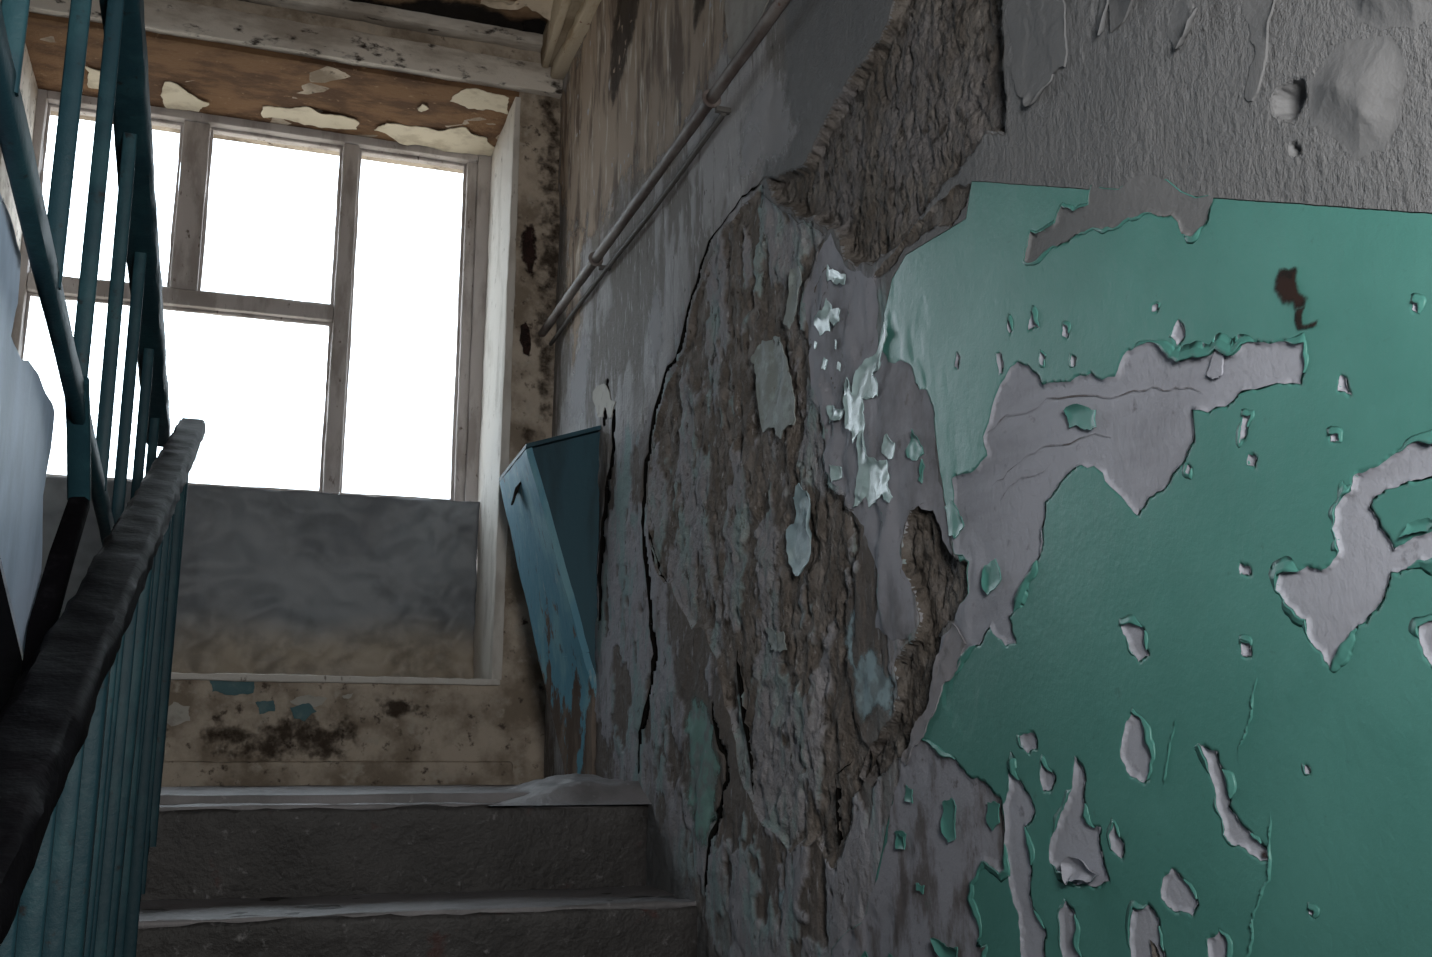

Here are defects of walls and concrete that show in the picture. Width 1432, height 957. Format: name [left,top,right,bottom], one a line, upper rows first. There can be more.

peeling [480,0,554,21]
peeling [85,66,100,89]
peeling [161,81,209,112]
peeling [450,88,509,114]
flaking render [1269,66,1321,125]
peeling [261,104,495,156]
crack [592,179,763,774]
flaking render [647,0,1309,957]
peeling [1268,429,1432,673]
damp [385,700,410,717]
damp [207,719,355,758]
crack [705,650,754,887]